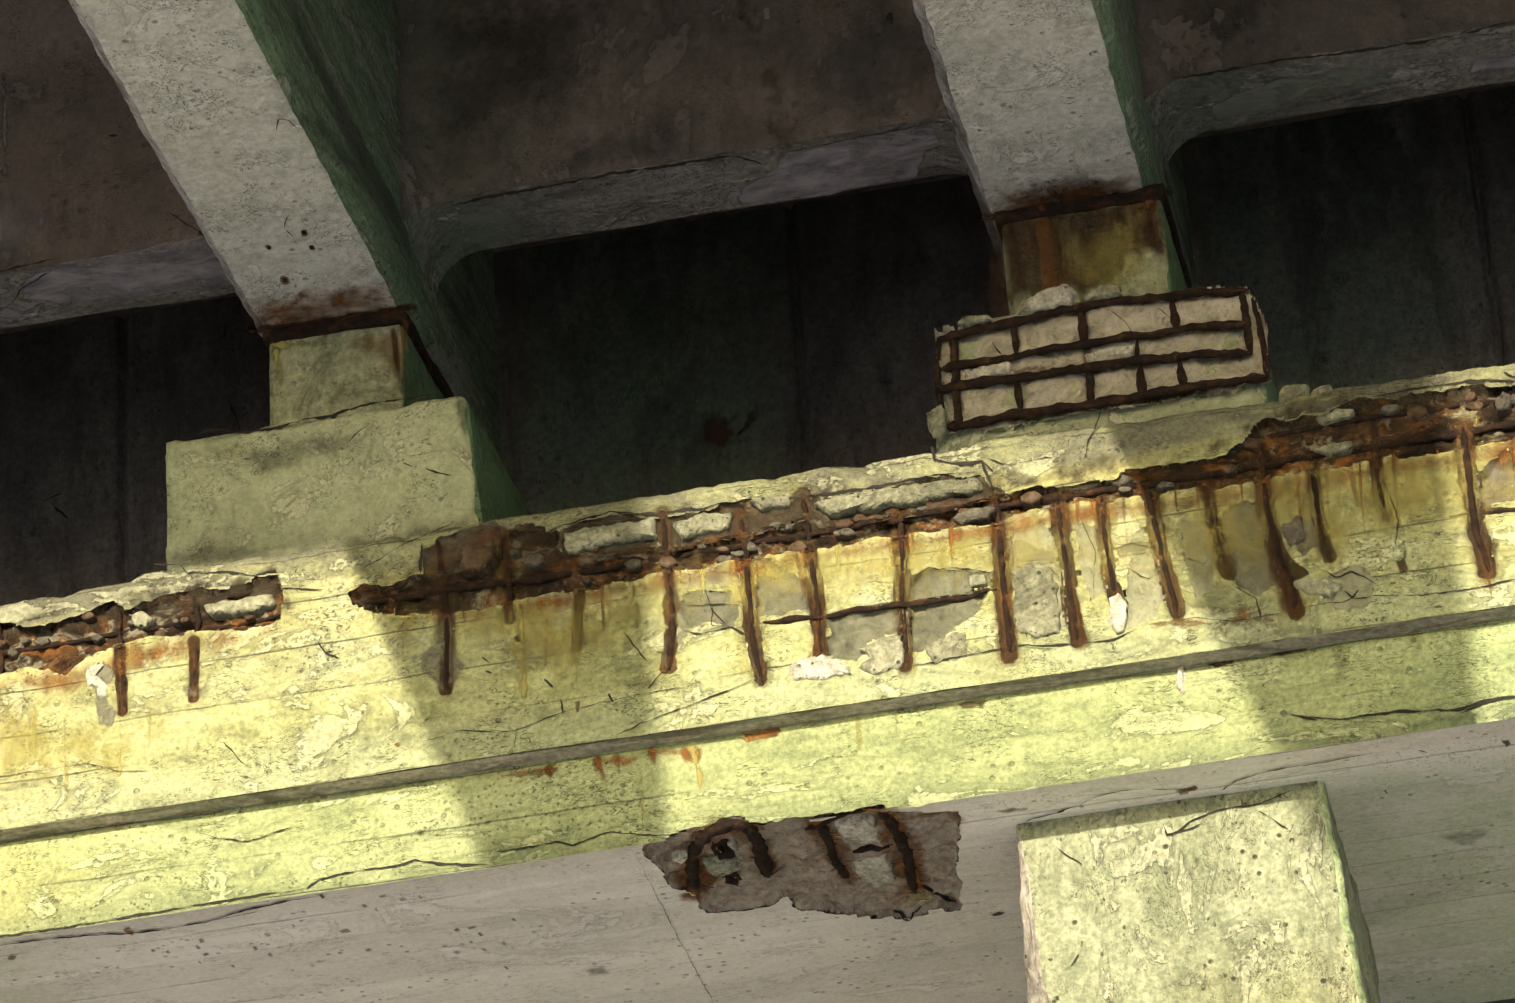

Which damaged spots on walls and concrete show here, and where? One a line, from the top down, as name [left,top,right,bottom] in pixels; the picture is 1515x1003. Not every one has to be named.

rust [978,180,1172,298]
rust [244,276,417,393]
spalling [348,381,1515,696]
rust [1397,554,1408,573]
spalling [0,574,290,726]
crack [1291,695,1515,721]
crack [0,831,712,998]
spalling [642,805,963,921]
crack [1014,754,1366,863]